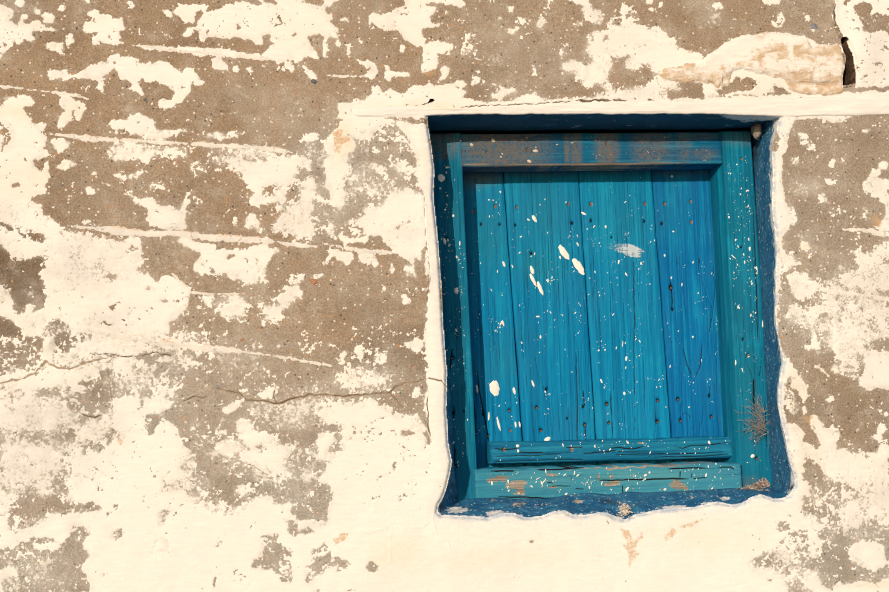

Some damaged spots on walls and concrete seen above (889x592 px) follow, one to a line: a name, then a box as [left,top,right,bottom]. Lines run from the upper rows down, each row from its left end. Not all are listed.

peeling [297,0,325,9]
peeling [843,0,889,55]
peeling [0,122,20,188]
peeling [0,206,51,246]
crack [0,352,174,384]
peeling [748,115,889,592]
peeling [0,379,27,415]
crack [183,377,447,436]
peeling [0,524,93,592]
peeling [111,528,125,541]
peeling [153,498,177,553]
peeling [366,560,380,573]